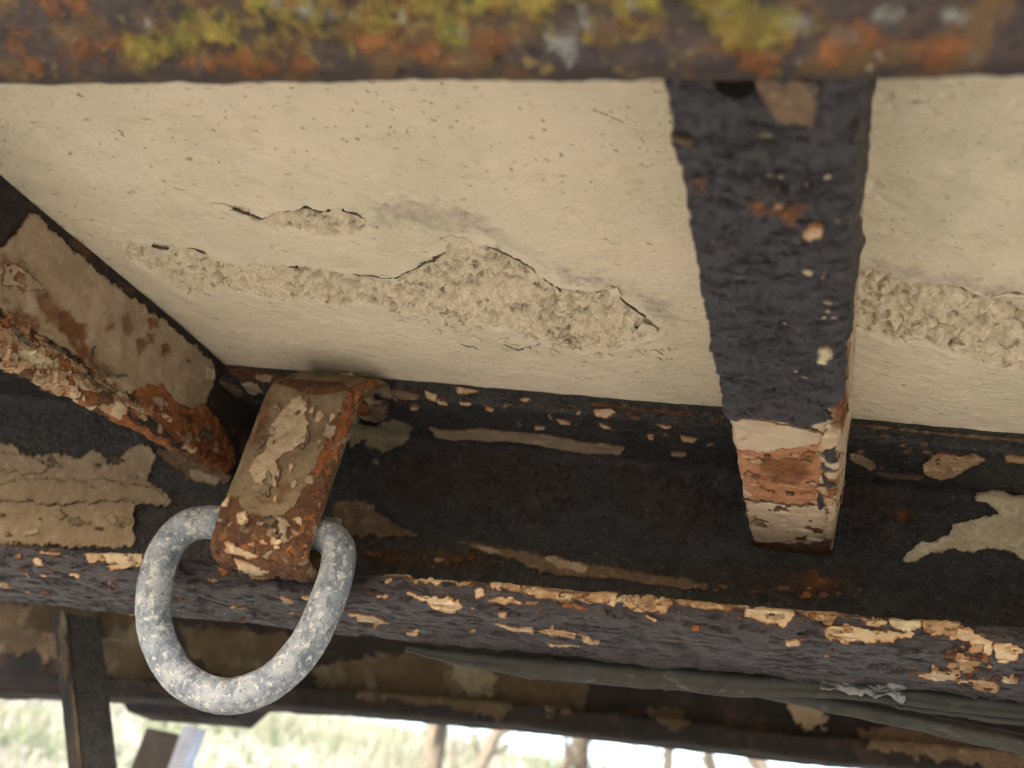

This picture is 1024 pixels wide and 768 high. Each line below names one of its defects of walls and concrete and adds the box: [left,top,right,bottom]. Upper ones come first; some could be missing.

rust [0,292,236,474]
peeling [0,432,248,665]
peeling [102,613,157,680]
peeling [0,213,285,420]
peeling [206,541,277,583]
rust [210,378,379,582]
spalling [128,235,673,364]
peeling [429,402,714,457]
peeling [383,540,1023,693]
rust [736,445,823,506]
peeling [657,79,1024,547]
peeling [903,490,1024,563]